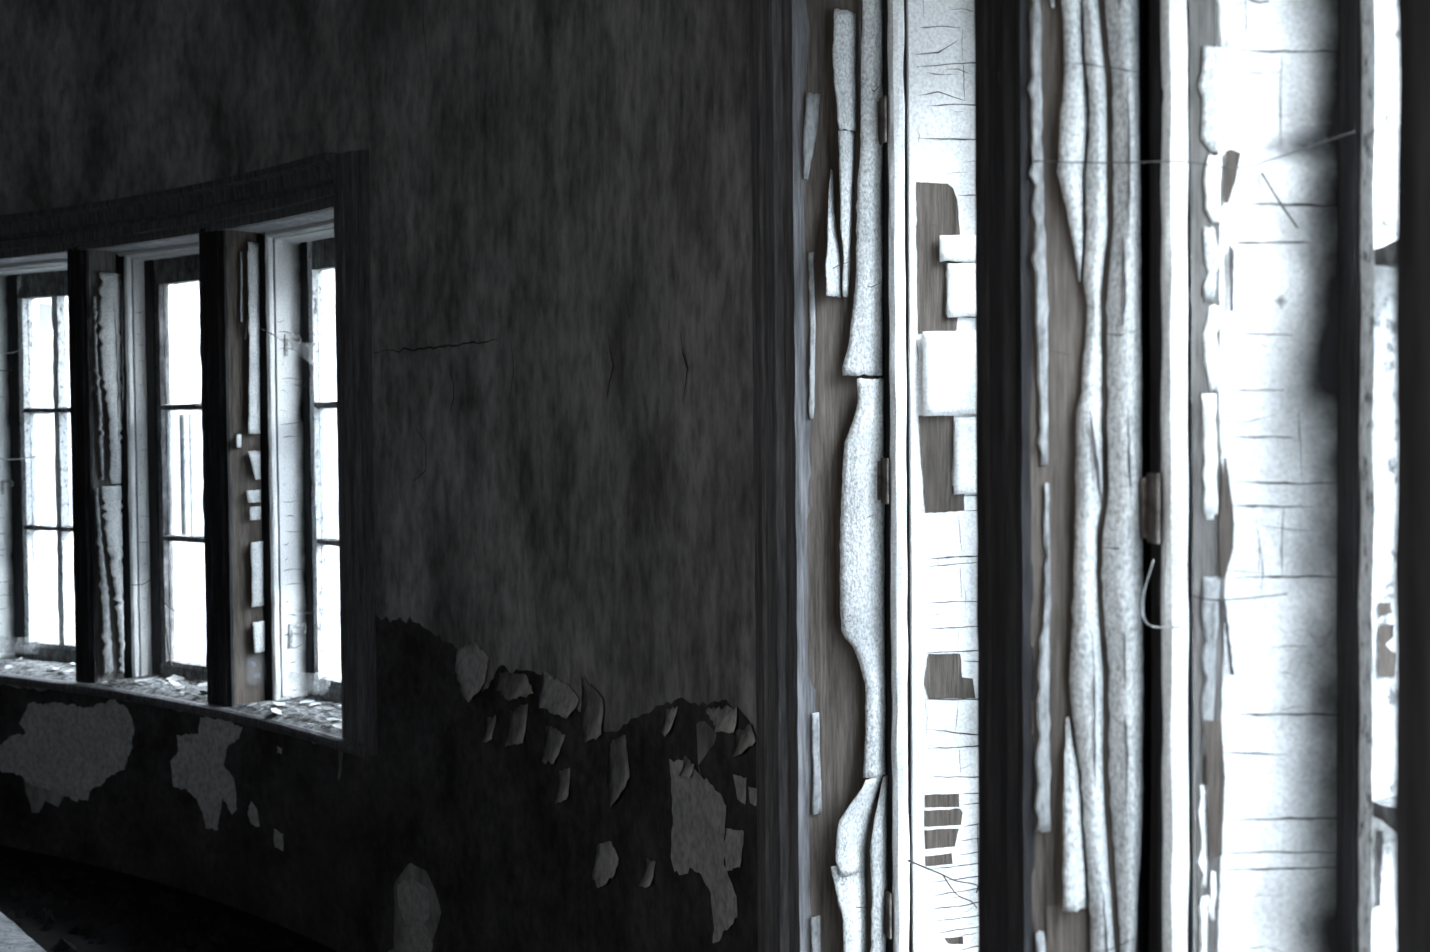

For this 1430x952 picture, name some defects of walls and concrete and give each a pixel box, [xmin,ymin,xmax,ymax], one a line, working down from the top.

crack [916,2,975,196]
crack [1222,203,1308,244]
peeling [916,182,976,513]
peeling [803,0,888,952]
peeling [1027,0,1144,952]
peeling [1189,0,1241,952]
crack [1216,389,1336,593]
peeling [924,653,975,699]
crack [922,490,979,952]
crack [1236,645,1311,716]
peeling [924,794,963,866]
crack [1210,817,1323,899]